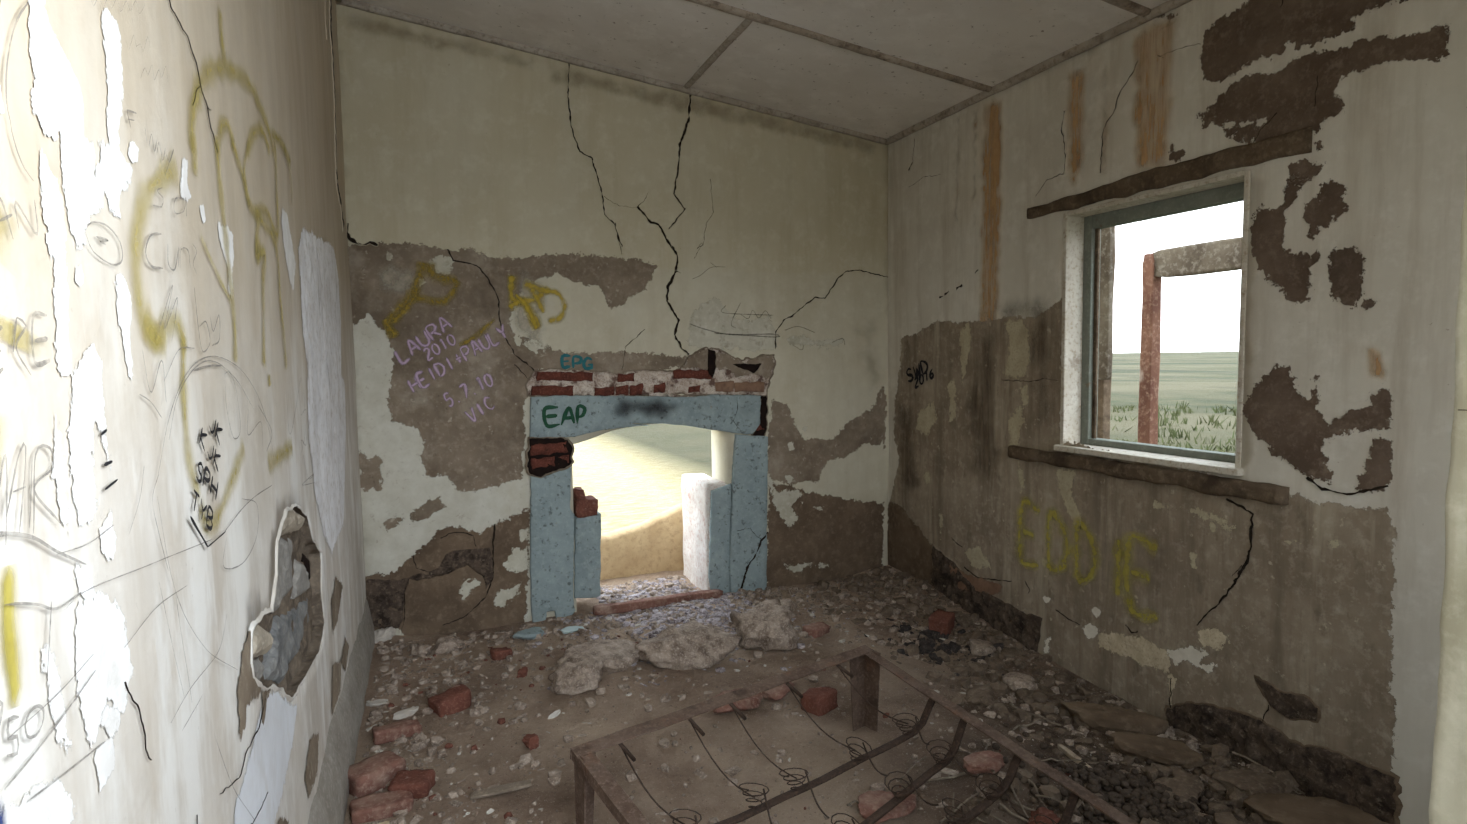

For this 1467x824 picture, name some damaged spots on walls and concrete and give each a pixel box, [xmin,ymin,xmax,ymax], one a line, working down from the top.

peeling [28,0,139,562]
crack [567,63,714,368]
rust [975,104,1001,321]
peeling [1168,144,1186,163]
peeling [1197,0,1451,311]
peeling [0,778,77,824]
peeling [41,562,134,792]
flaking render [234,503,349,824]
peeling [348,241,1403,824]
crack [1197,498,1254,625]